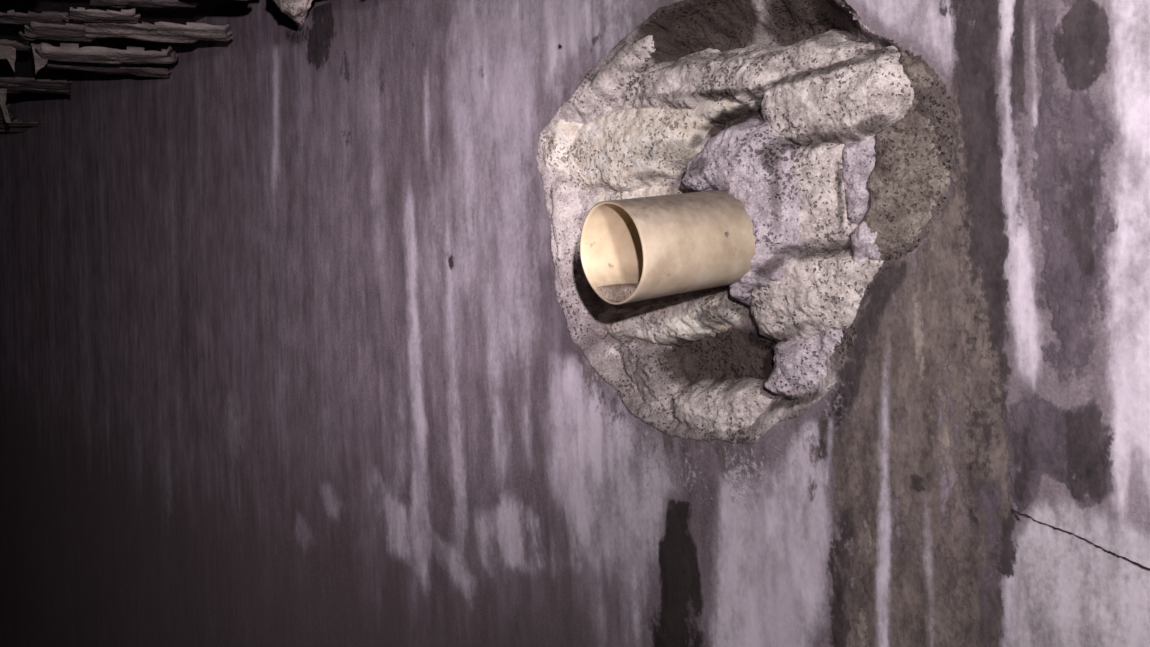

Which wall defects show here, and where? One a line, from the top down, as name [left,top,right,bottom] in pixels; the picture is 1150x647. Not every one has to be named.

peeling [0,45,16,72]
peeling [31,43,48,75]
peeling [0,88,11,123]
water stain [549,0,1150,647]
crack [1011,509,1150,570]